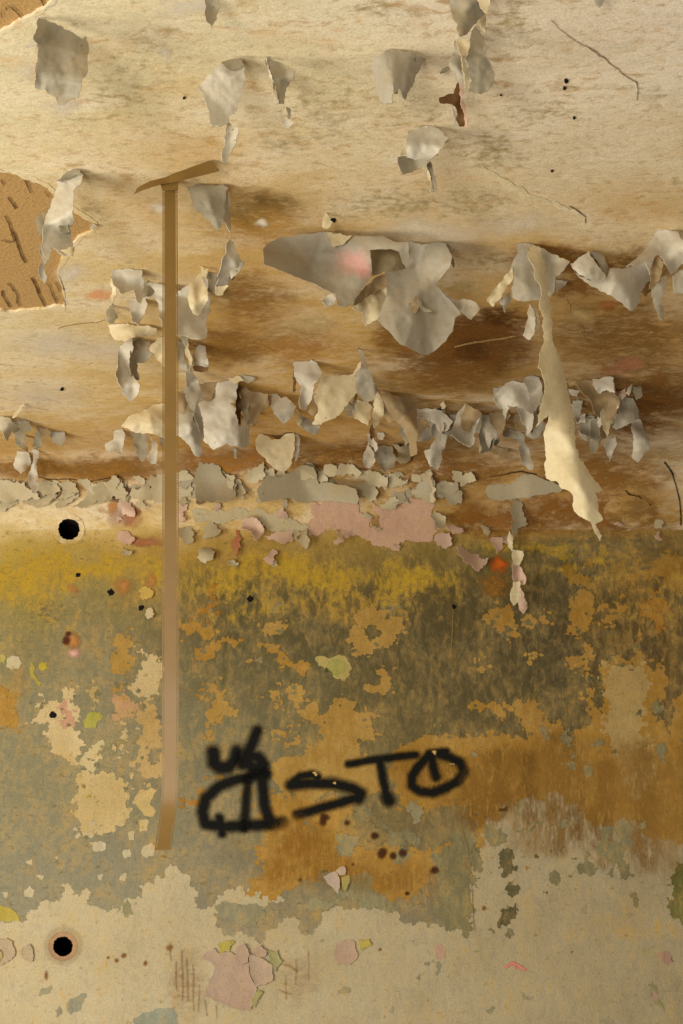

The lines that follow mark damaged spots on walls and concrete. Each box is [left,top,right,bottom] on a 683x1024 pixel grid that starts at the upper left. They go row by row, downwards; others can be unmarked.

peeling [0,0,89,105]
peeling [372,49,422,103]
peeling [397,0,495,192]
crack [551,20,638,100]
water stain [539,244,639,296]
water stain [377,308,530,388]
peeling [0,169,683,649]
water stain [1,457,154,481]
water stain [303,441,505,484]
water stain [451,499,584,536]
crack [664,462,682,525]
flaking render [0,519,683,1024]